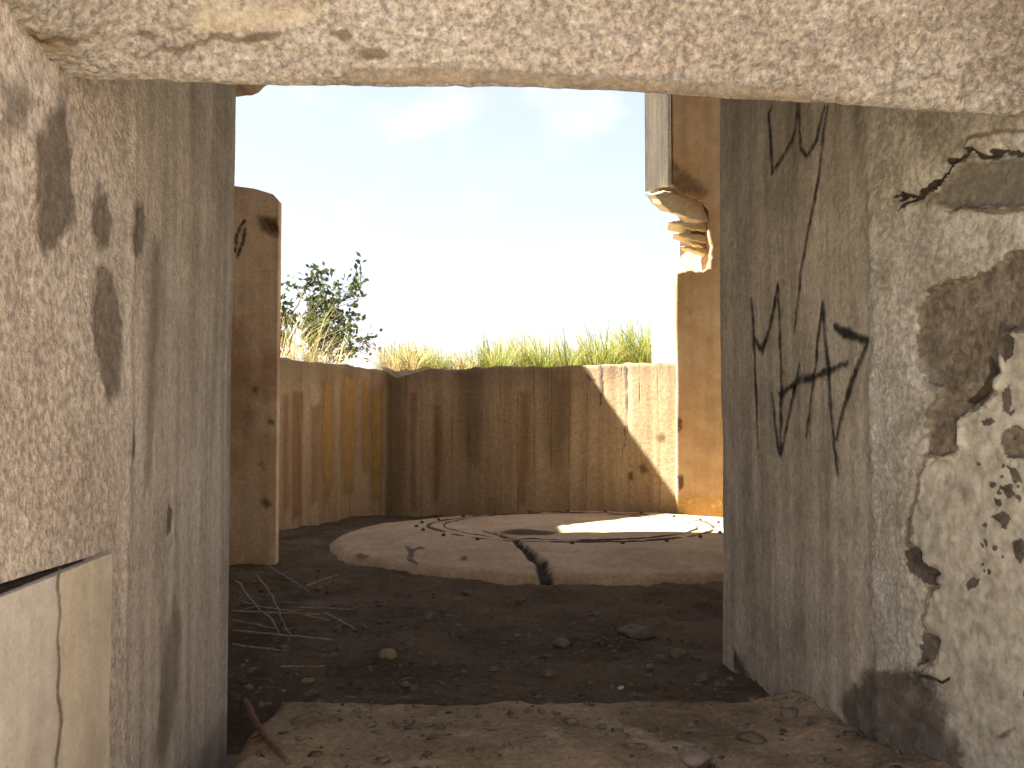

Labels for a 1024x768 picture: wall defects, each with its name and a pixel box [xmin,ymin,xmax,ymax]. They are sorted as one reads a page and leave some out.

damp [37,111,75,249]
damp [92,187,112,247]
damp [133,207,145,257]
crack [894,128,1024,214]
damp [92,267,122,400]
peeling [867,208,1024,768]
crack [493,534,552,586]
crack [0,552,102,767]
damp [842,670,964,768]